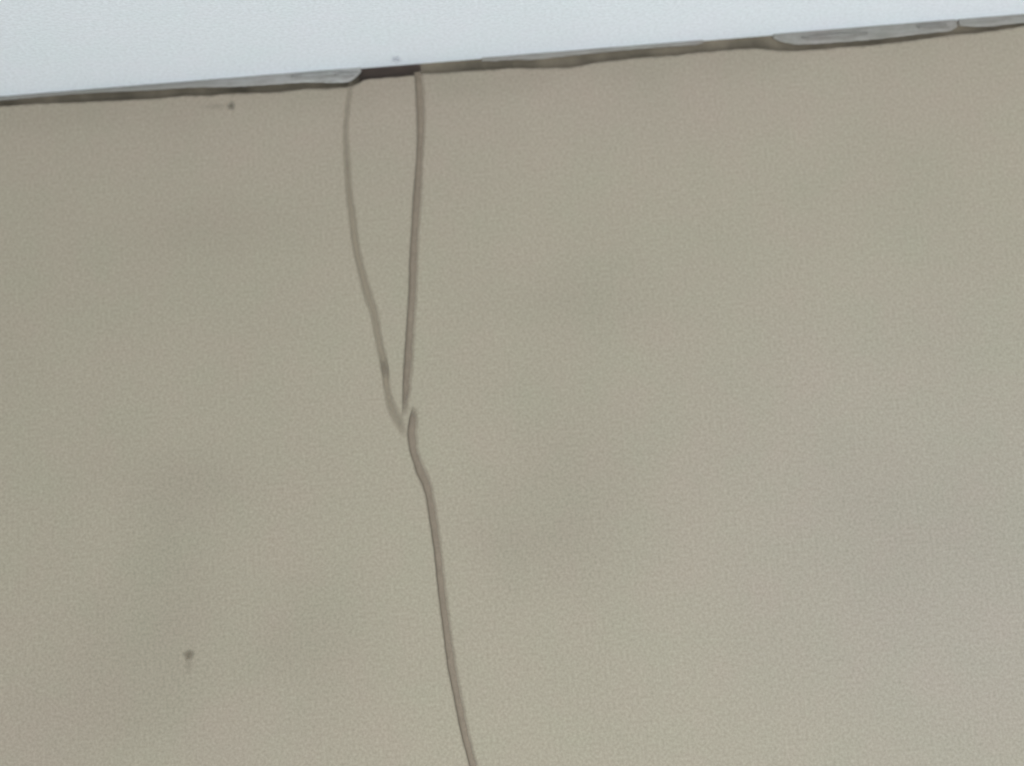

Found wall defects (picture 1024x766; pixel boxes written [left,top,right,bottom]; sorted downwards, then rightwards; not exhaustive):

crack [0,75,360,106]
crack [345,21,1024,766]